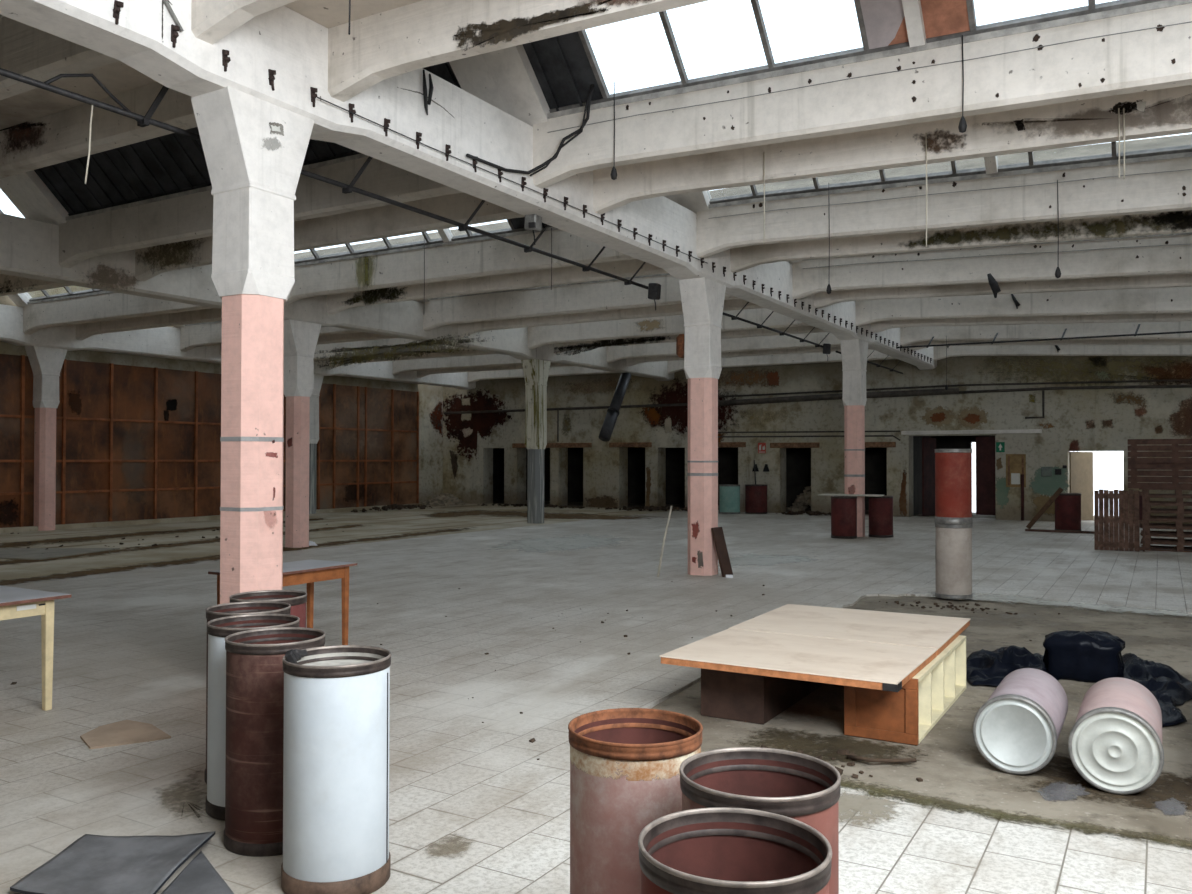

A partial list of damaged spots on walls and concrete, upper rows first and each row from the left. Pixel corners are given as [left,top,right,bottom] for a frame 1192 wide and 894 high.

mould [453,0,650,51]
damp [0,122,47,152]
mould [900,211,1192,248]
mould [138,240,200,271]
mould [87,265,137,290]
damp [318,332,479,368]
peeling [461,398,473,437]